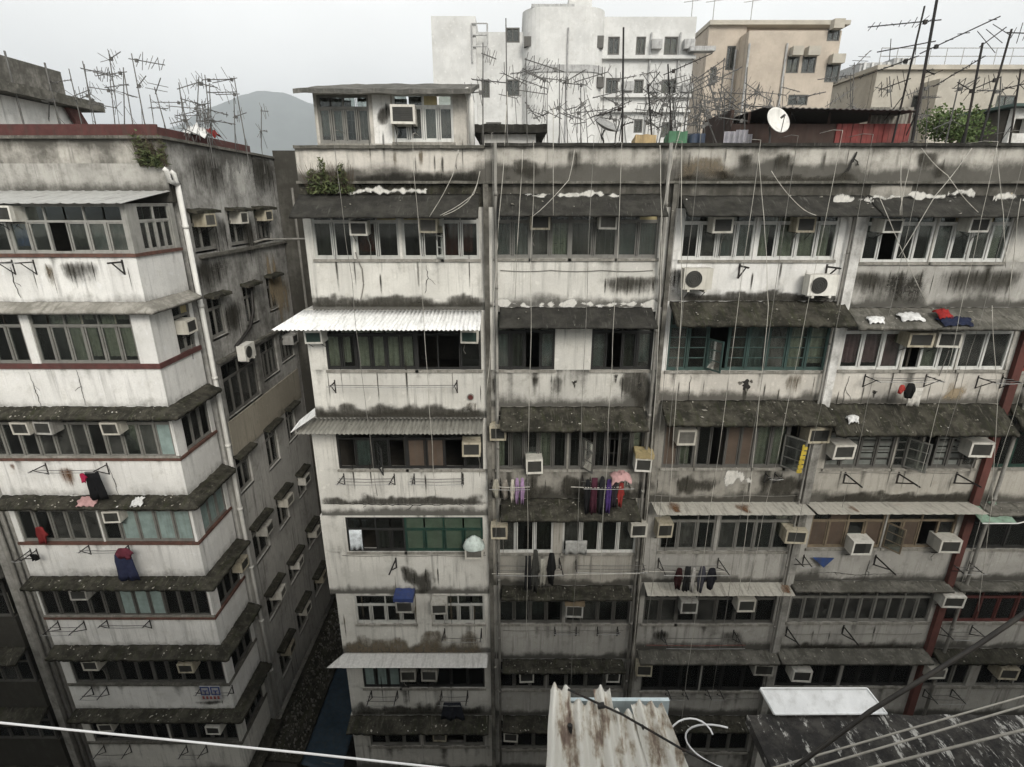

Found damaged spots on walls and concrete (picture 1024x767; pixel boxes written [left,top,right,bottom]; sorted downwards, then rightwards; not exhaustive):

water stain [356,106,478,185]
water stain [673,151,855,181]
water stain [919,152,945,176]
water stain [46,264,95,289]
water stain [311,275,482,307]
water stain [855,272,934,303]
water stain [948,269,1019,292]
water stain [677,477,715,494]
peeling [724,471,752,486]
water stain [748,474,802,497]
water stain [395,566,439,620]
water stain [343,608,480,653]